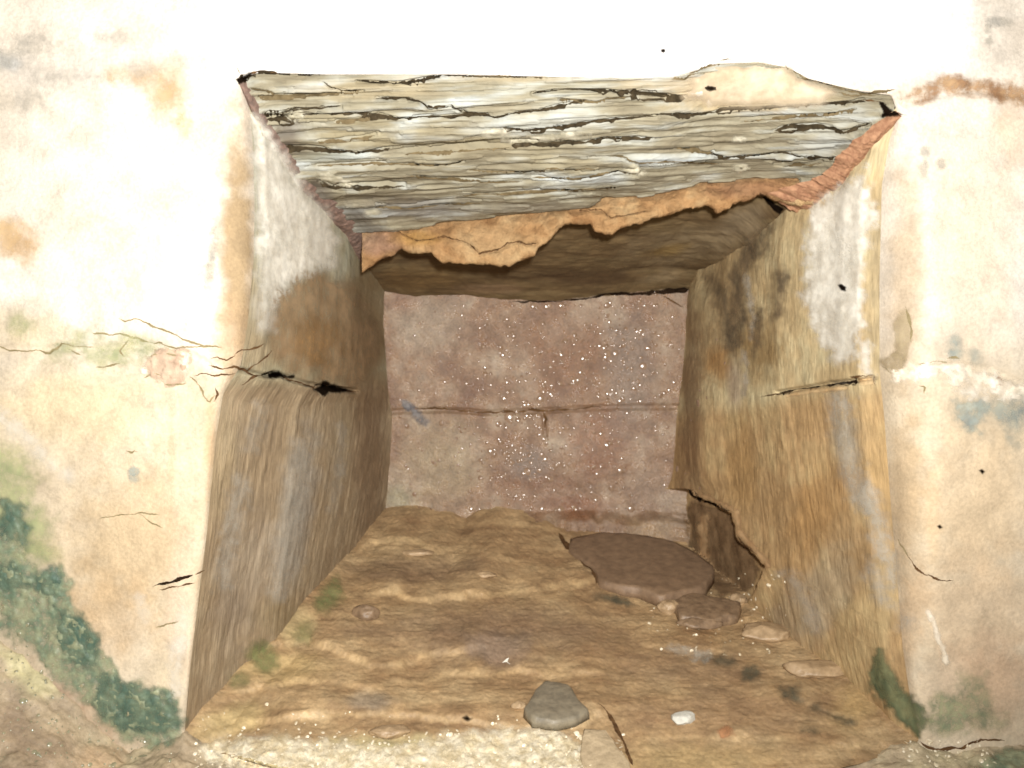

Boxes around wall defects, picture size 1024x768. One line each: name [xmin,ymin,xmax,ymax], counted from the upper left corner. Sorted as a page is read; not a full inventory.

crack [785,65,896,102]
crack [0,318,358,402]
crack [761,374,875,397]
crack [153,570,204,590]
flaking render [685,490,770,597]
crack [898,540,952,581]